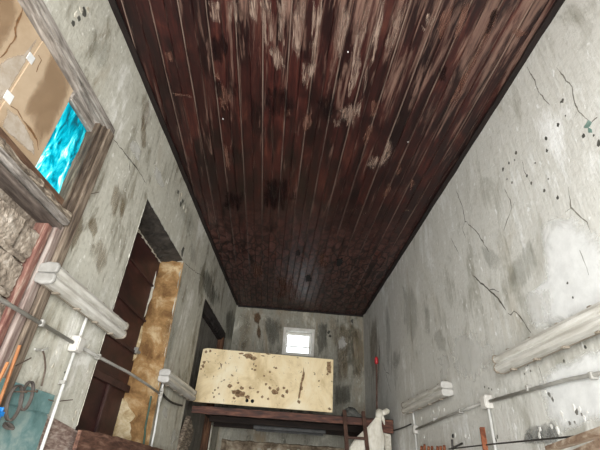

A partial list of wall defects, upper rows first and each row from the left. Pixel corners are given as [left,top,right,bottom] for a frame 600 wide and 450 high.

peeling [269,0,287,69]
peeling [302,6,322,89]
peeling [348,8,368,97]
peeling [385,5,406,54]
crack [557,68,588,120]
crack [451,191,489,256]
crack [474,276,531,333]